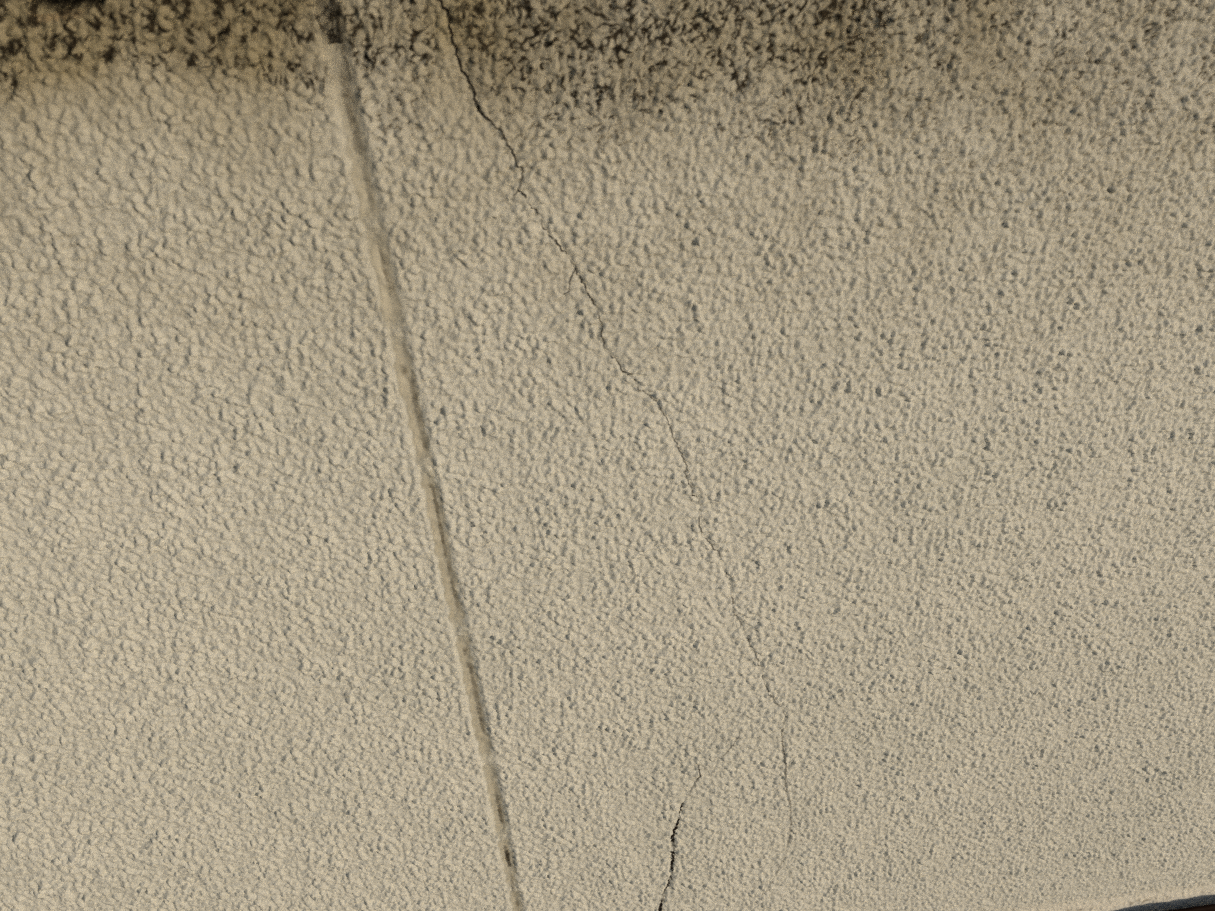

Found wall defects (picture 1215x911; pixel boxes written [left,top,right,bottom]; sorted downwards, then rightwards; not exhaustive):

water stain [0,0,436,106]
water stain [451,0,971,137]
water stain [986,0,1098,76]
crack [438,0,720,555]
crack [658,769,701,911]